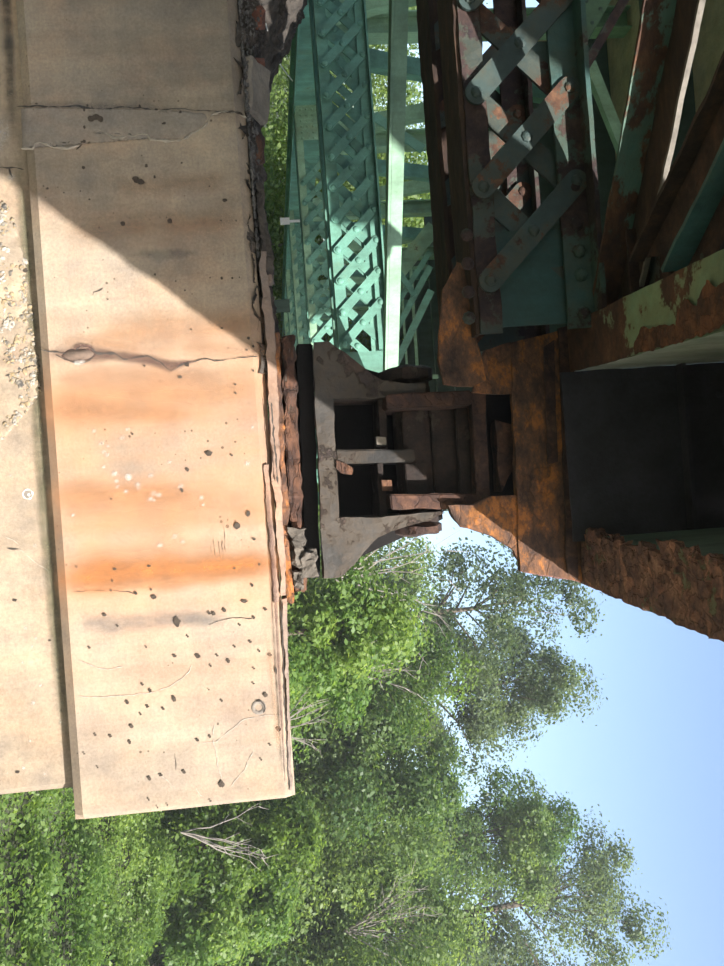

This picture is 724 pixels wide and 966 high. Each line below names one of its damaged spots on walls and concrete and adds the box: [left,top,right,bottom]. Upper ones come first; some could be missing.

crack [17,104,219,112]
spalling [0,200,42,441]
corrosion [633,280,724,355]
crack [6,347,257,376]